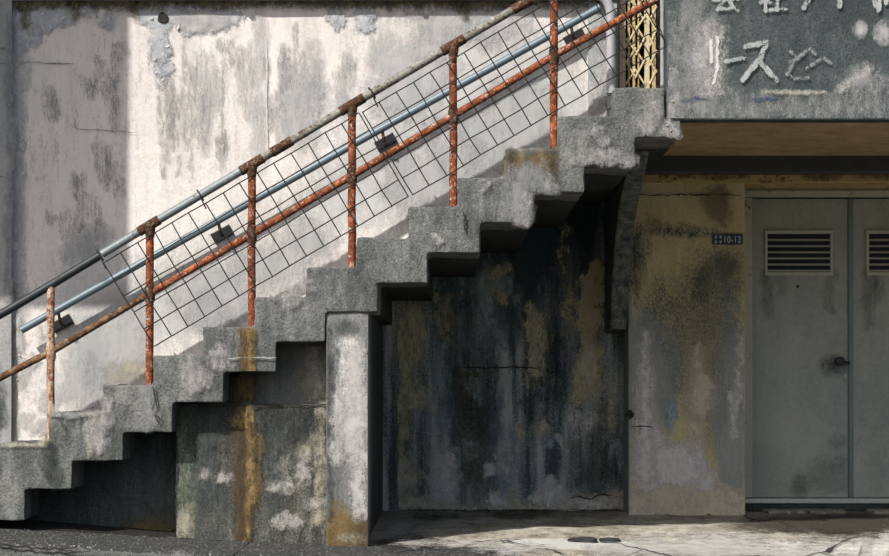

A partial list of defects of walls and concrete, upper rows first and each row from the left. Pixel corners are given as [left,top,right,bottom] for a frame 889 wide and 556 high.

peeling [135,4,246,87]
leakage [279,50,323,148]
leakage [382,79,604,479]
leakage [0,304,159,484]
crack [150,387,160,423]
leakage [131,344,234,540]
rust [231,405,262,542]
rust [238,327,257,371]
leakage [258,319,367,547]
leakage [397,328,745,515]
crack [610,542,672,556]
crack [806,533,862,556]